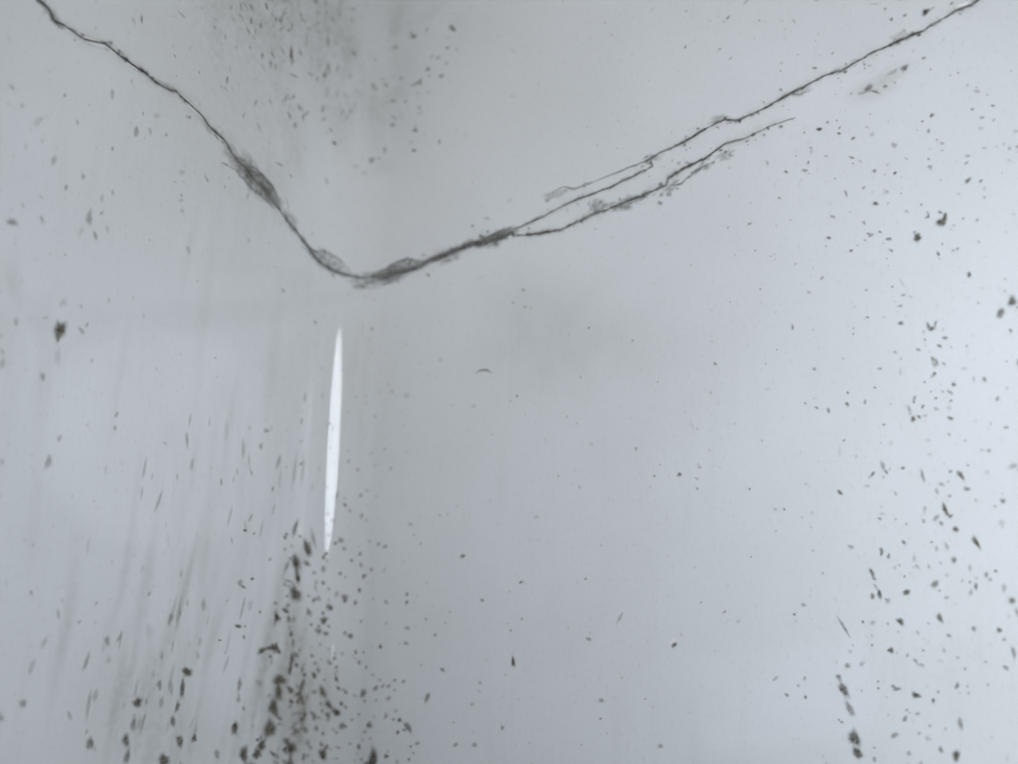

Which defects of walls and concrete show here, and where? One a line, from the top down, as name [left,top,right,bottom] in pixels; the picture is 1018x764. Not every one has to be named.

crack [29,0,989,283]
mould [284,524,311,599]
mould [241,644,346,764]